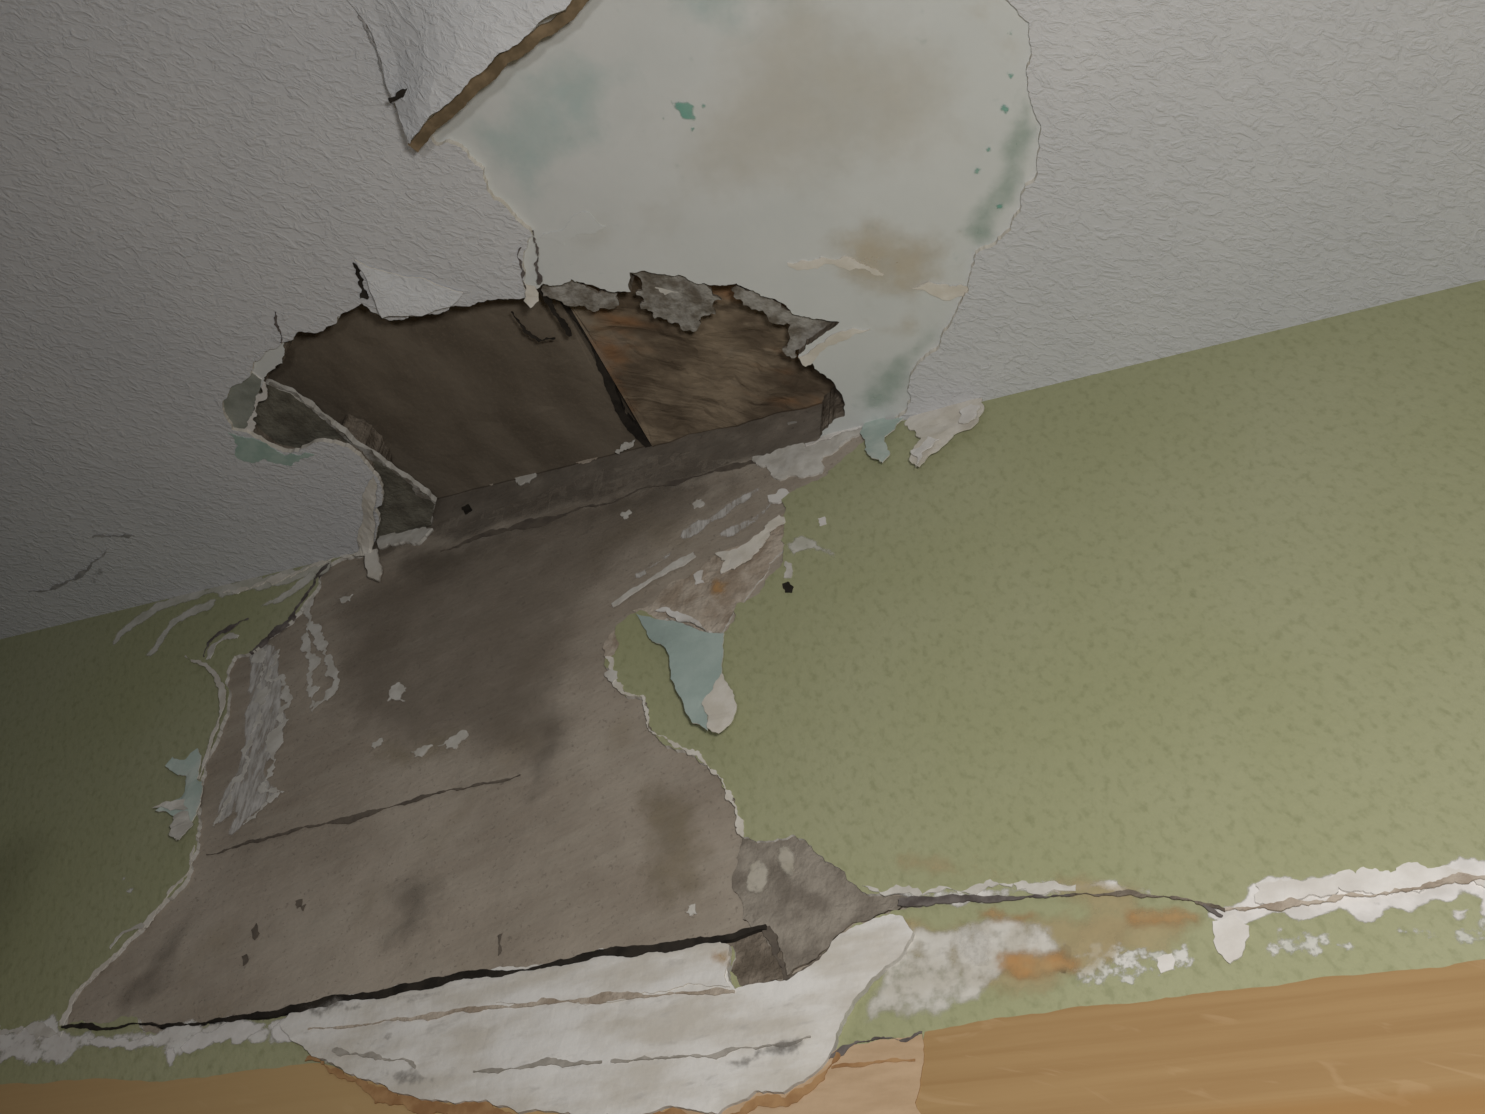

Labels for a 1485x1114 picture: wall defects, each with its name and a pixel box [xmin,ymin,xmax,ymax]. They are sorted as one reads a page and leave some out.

leakage [675,103,704,129]
flaking render [59,0,1057,1034]
crack [206,774,520,855]
crack [898,872,1485,918]
leakage [862,879,1183,988]
peeling [1074,943,1193,985]
peeling [1267,932,1353,956]
peeling [1456,918,1485,944]
crack [61,924,829,1074]